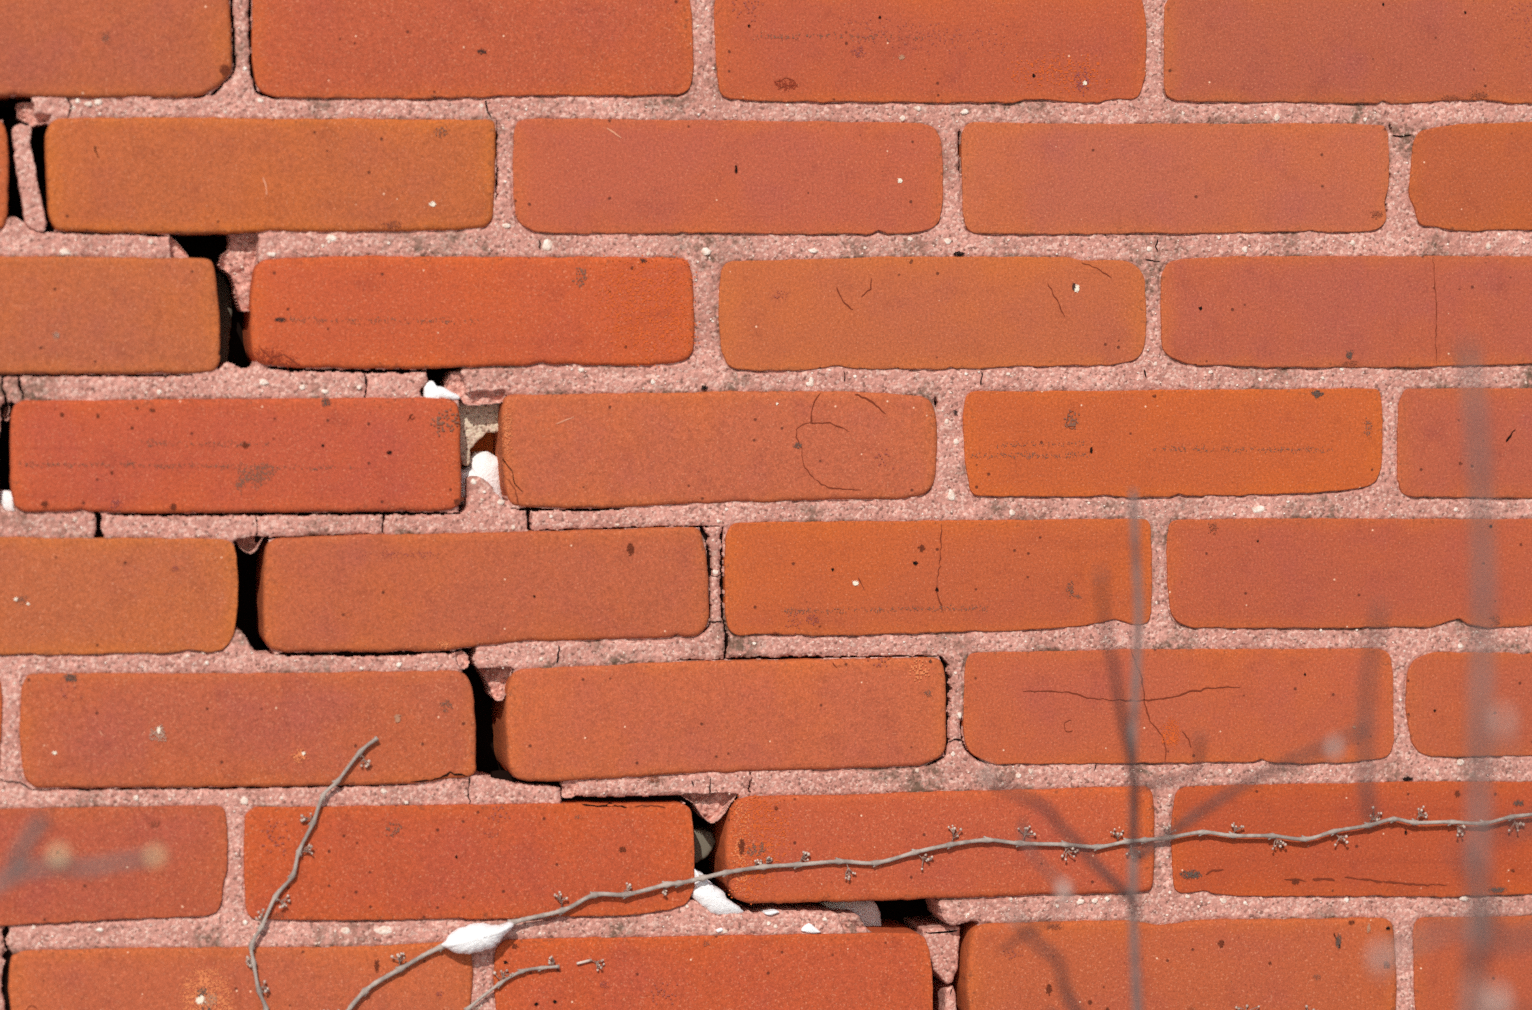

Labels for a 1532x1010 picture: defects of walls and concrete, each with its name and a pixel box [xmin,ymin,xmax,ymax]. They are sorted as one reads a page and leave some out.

crack [485,100,497,197]
crack [0,98,455,420]
crack [836,279,872,310]
crack [0,374,176,490]
crack [796,372,886,490]
crack [502,459,983,765]
crack [0,510,819,905]
crack [1023,650,1239,759]
crack [1,926,38,1010]
crack [874,899,932,924]